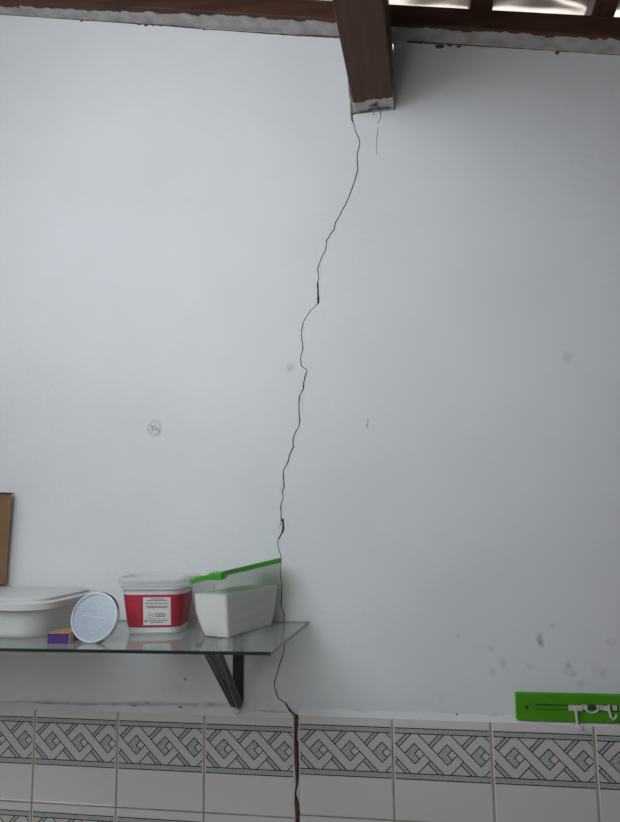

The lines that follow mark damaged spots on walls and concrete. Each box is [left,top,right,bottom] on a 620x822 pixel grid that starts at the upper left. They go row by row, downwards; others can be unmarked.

crack [274,111,382,822]